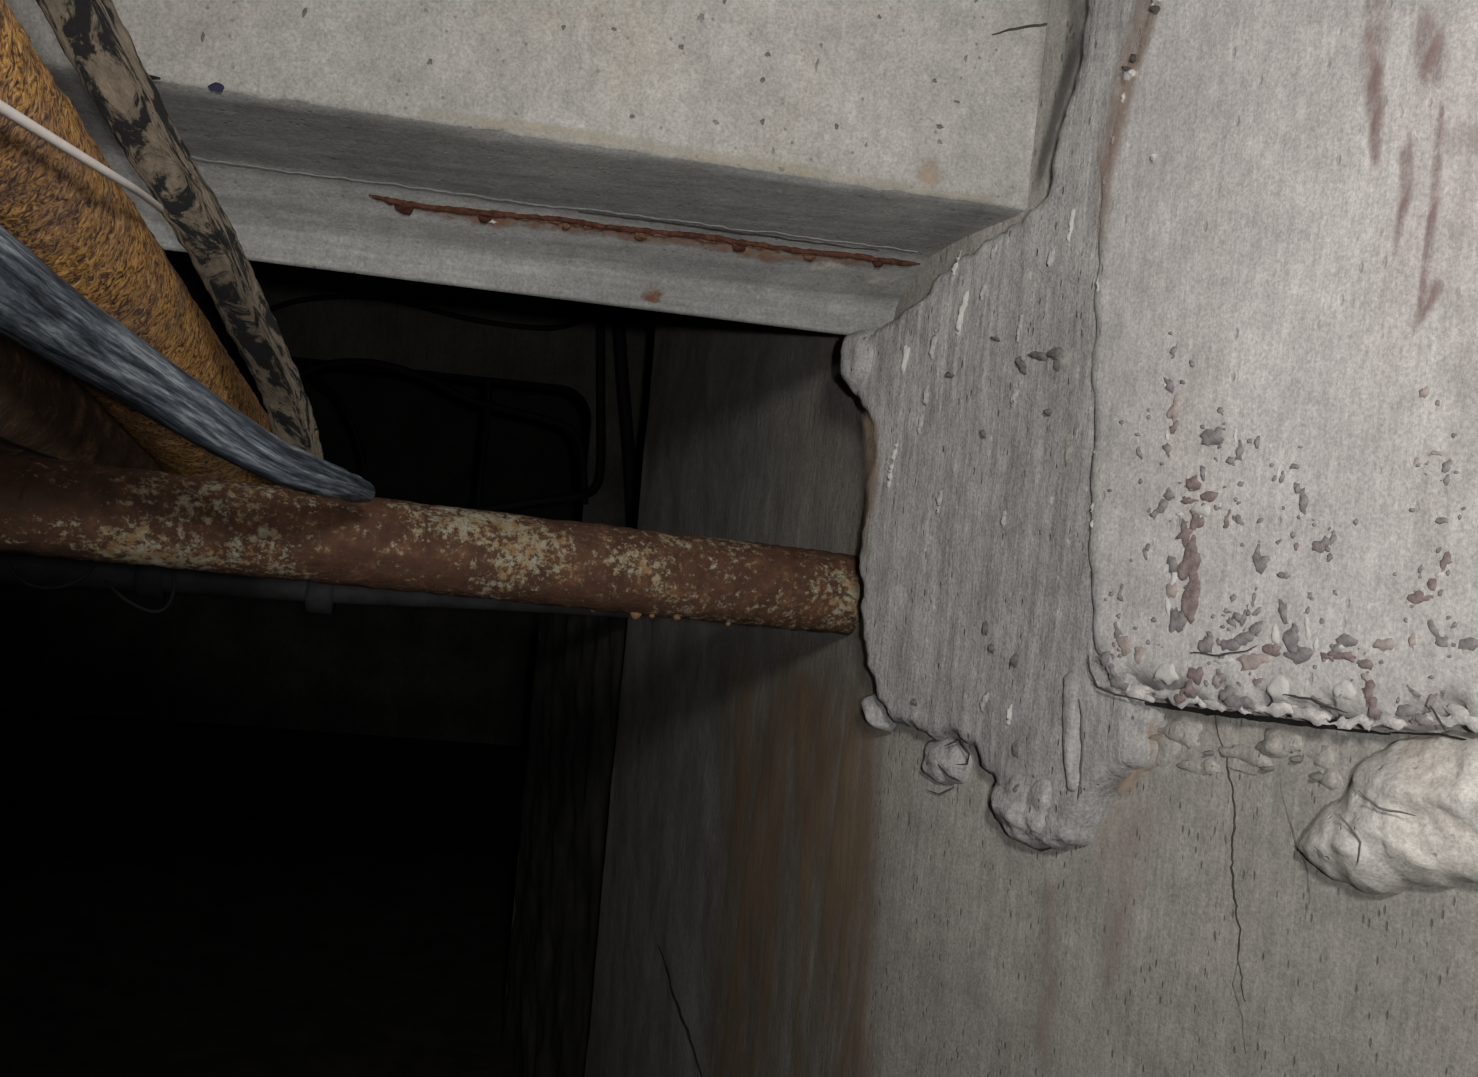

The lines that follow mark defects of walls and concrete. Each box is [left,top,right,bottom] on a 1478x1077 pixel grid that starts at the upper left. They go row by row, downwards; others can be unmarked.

spalling [1101,0,1165,185]
corrosion [1368,31,1382,136]
corrosion [1420,158,1439,315]
peeling [1419,385,1440,406]
spalling [1088,407,1478,790]
crack [1144,702,1467,1054]